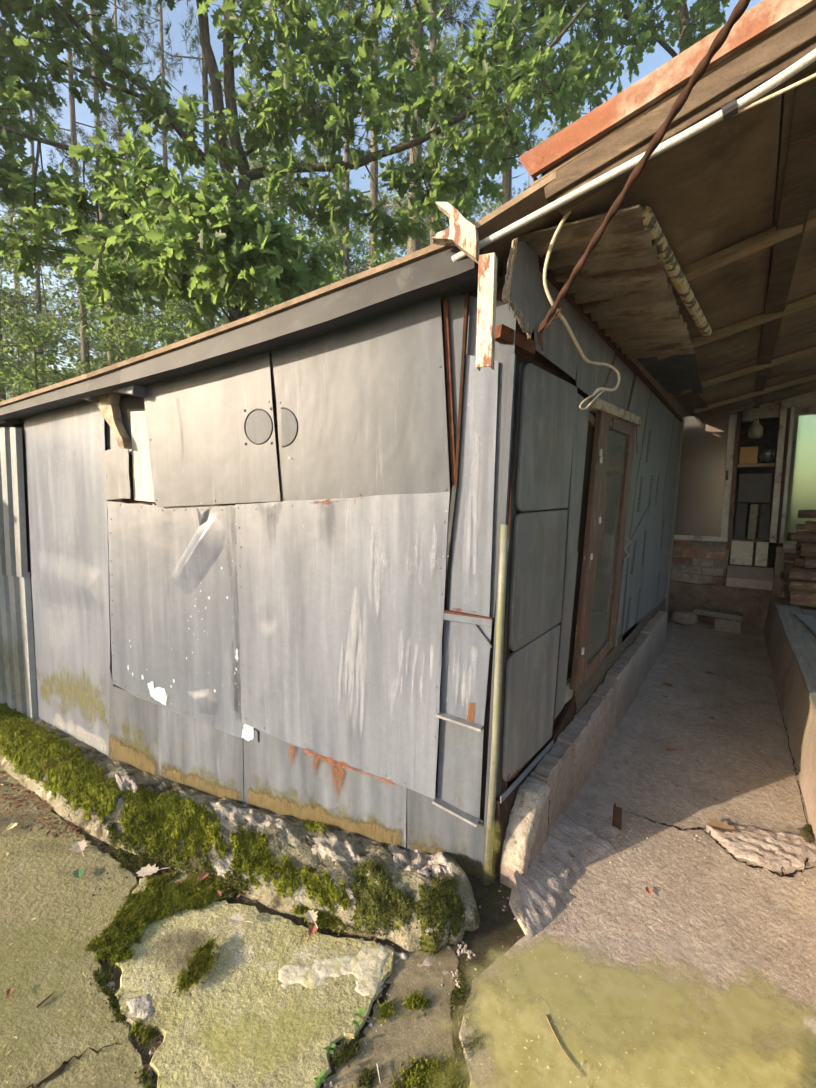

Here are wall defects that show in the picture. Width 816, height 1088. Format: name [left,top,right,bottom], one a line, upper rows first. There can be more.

corrosion [520,0,816,181]
peeling [127,665,175,706]
peeling [242,724,254,741]
corrosion [289,746,393,794]
crack [622,681,816,877]
crack [27,1041,124,1088]